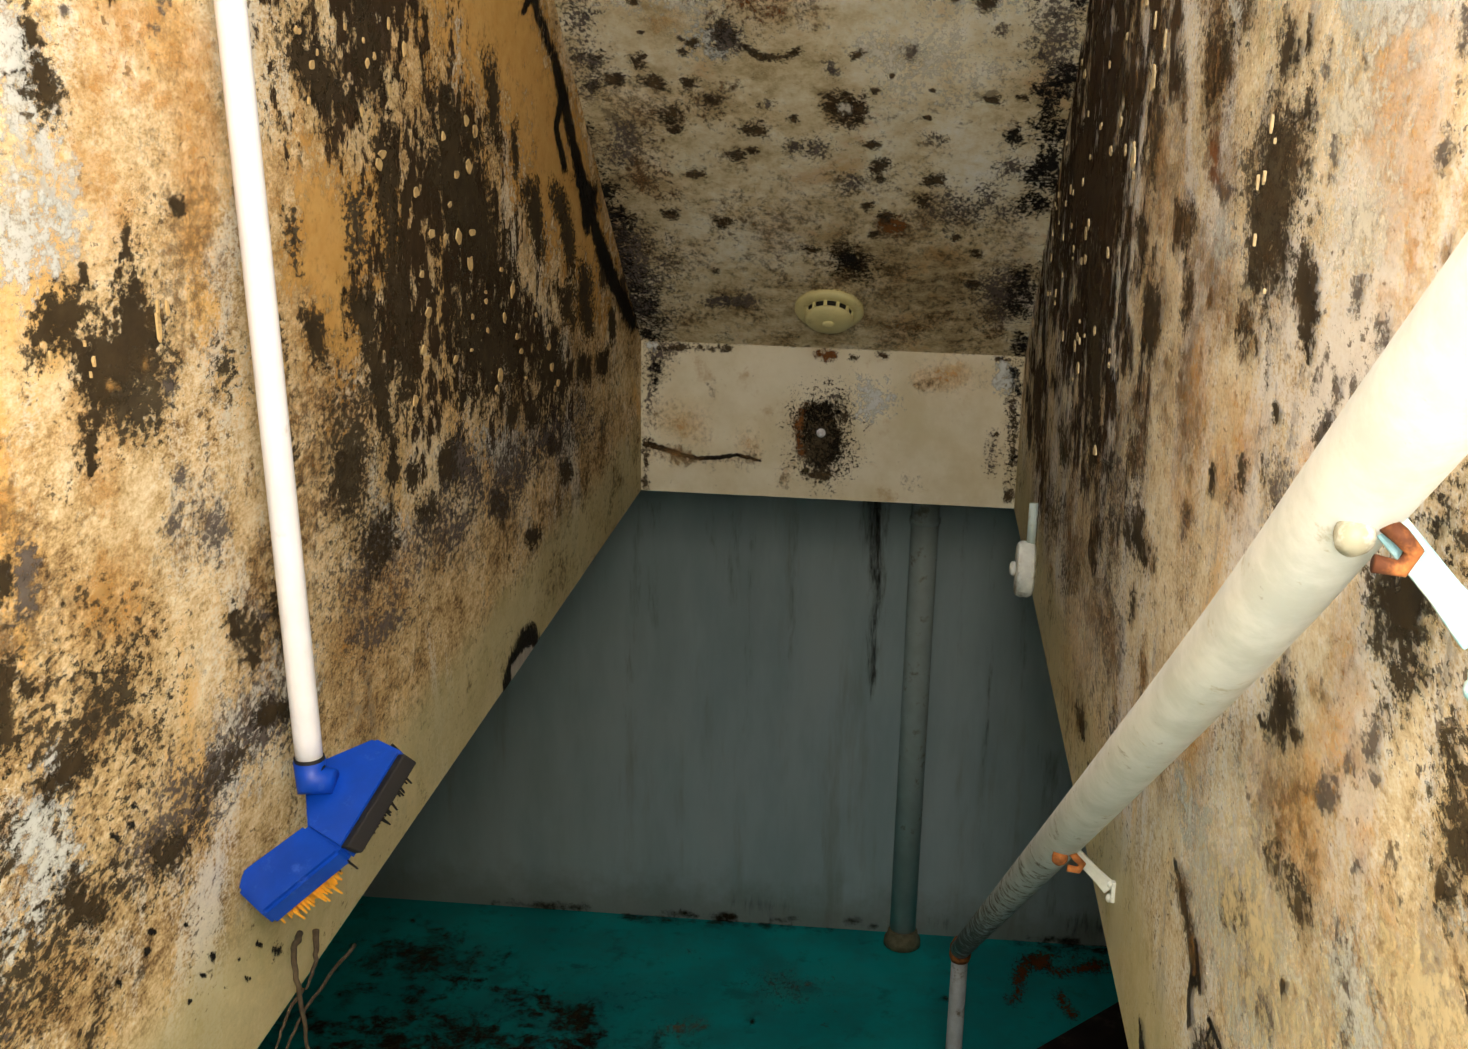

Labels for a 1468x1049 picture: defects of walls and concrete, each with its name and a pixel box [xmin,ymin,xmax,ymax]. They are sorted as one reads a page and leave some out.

damp [0,0,251,486]
damp [156,459,247,587]
crack [649,441,761,467]
damp [250,0,1468,765]